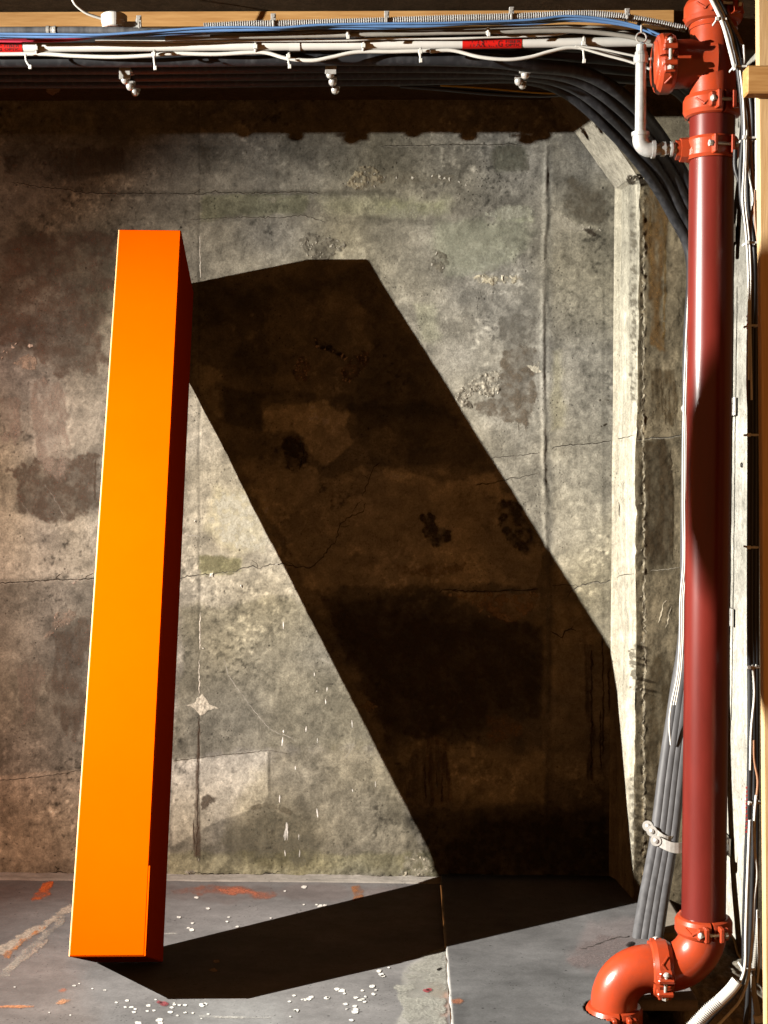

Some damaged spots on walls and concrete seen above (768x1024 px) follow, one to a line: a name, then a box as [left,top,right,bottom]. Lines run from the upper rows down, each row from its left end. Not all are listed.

spalling [455,370,501,408]
water stain [7,371,99,522]
crack [477,434,681,485]
crack [180,463,379,579]
water stain [420,512,451,547]
water stain [498,499,533,551]
crack [0,573,95,584]